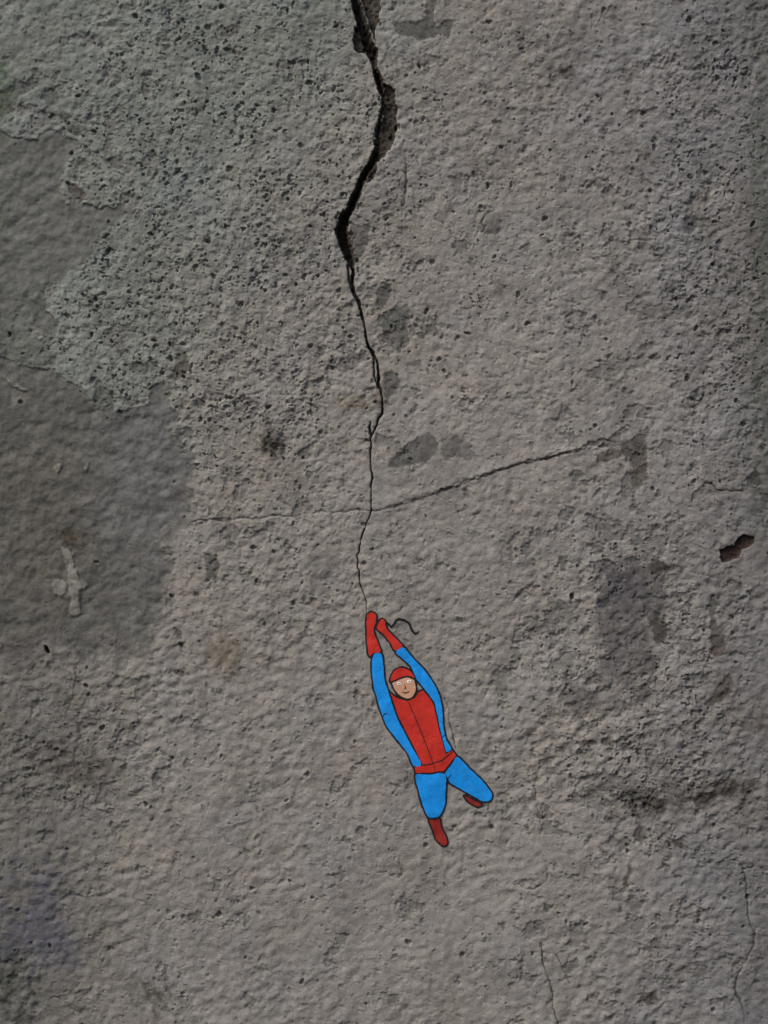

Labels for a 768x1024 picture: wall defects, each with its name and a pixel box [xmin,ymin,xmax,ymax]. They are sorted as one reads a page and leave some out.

crack [333,0,616,616]
spalling [720,535,755,563]